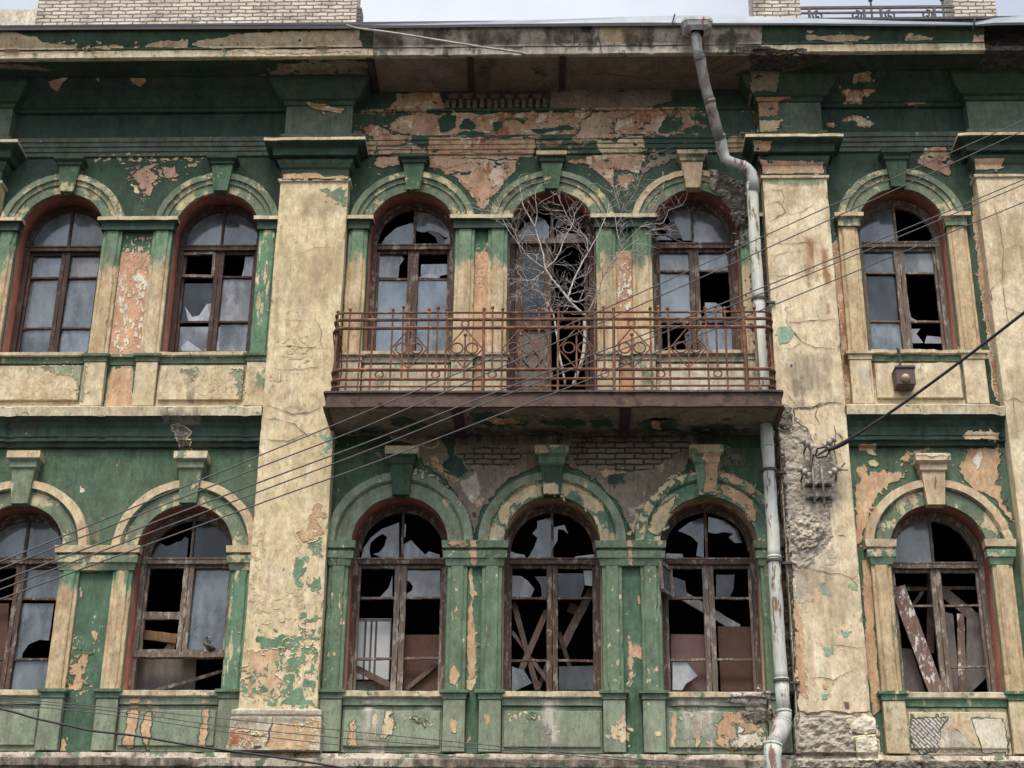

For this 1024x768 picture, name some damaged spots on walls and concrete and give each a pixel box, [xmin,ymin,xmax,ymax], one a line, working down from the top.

peeling [0,28,368,91]
peeling [94,152,207,210]
peeling [362,89,697,214]
crack [767,189,814,277]
peeling [111,236,153,352]
crack [783,307,833,349]
crack [783,397,843,463]
flaking render [390,409,764,690]
spalling [773,405,1024,768]
peeling [65,631,98,695]
peeling [224,525,332,764]
peeling [655,688,776,754]